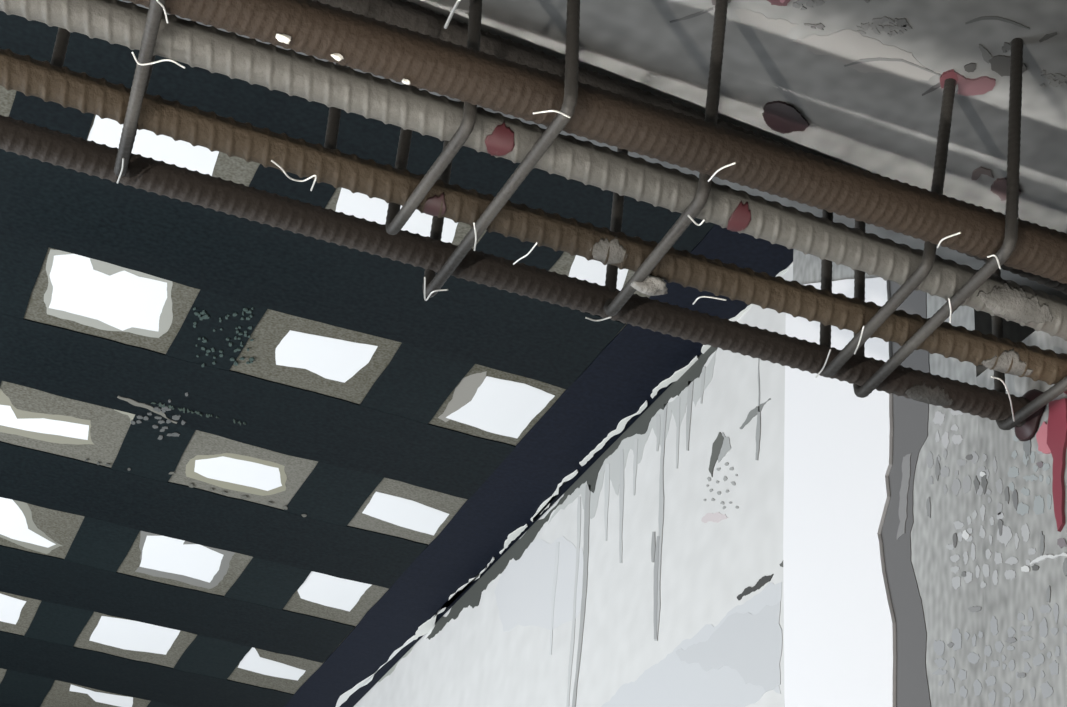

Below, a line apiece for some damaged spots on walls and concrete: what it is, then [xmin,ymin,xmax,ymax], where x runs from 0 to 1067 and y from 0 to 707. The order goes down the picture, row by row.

spalling [964,44,1027,77]
water stain [740,398,771,460]
water stain [701,432,739,523]
water stain [378,346,718,707]
water stain [601,582,783,707]